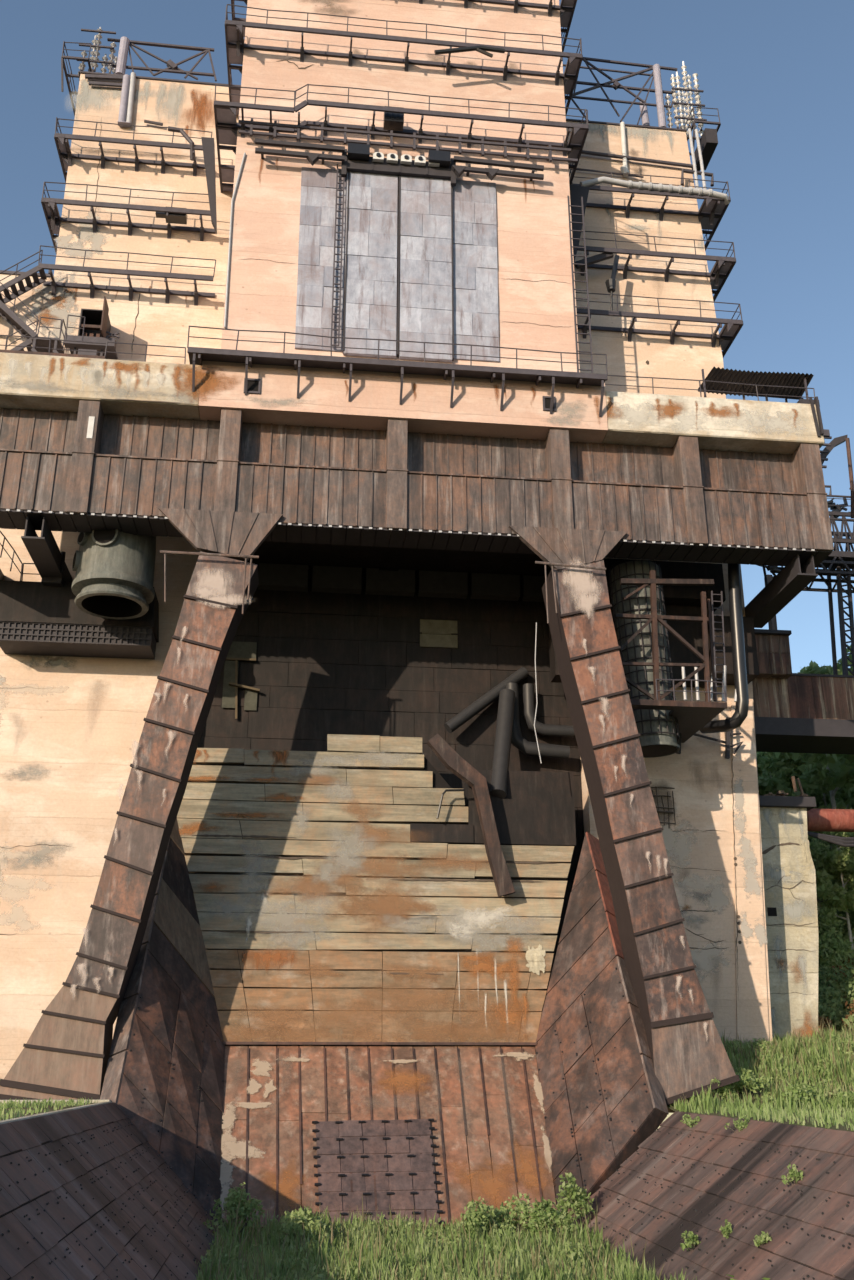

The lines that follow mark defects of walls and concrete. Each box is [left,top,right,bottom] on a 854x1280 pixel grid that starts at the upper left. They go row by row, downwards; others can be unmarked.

rust [50,358,237,396]
rust [594,397,621,417]
rust [656,399,739,419]
rust [179,750,302,835]
rust [271,803,484,924]
crack [670,747,813,1001]
rust [396,942,528,1042]
rust [266,1170,300,1209]
rust [457,1145,545,1208]